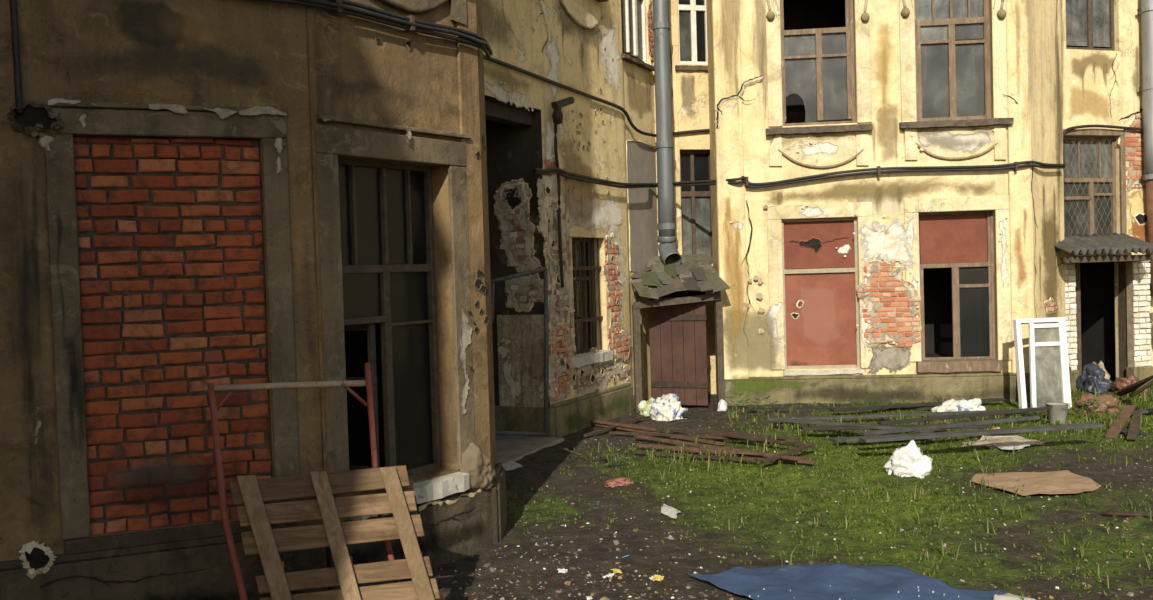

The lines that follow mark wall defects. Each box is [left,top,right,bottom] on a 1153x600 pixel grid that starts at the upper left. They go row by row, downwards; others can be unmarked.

water stain [1061,29,1113,86]
spalling [7,95,96,159]
spalling [149,103,188,114]
spalling [203,106,287,119]
flaking render [484,80,535,111]
crack [714,75,763,128]
flaking render [1118,113,1147,237]
flaking render [493,16,658,404]
flaking render [835,214,922,374]
flaking render [460,269,489,414]